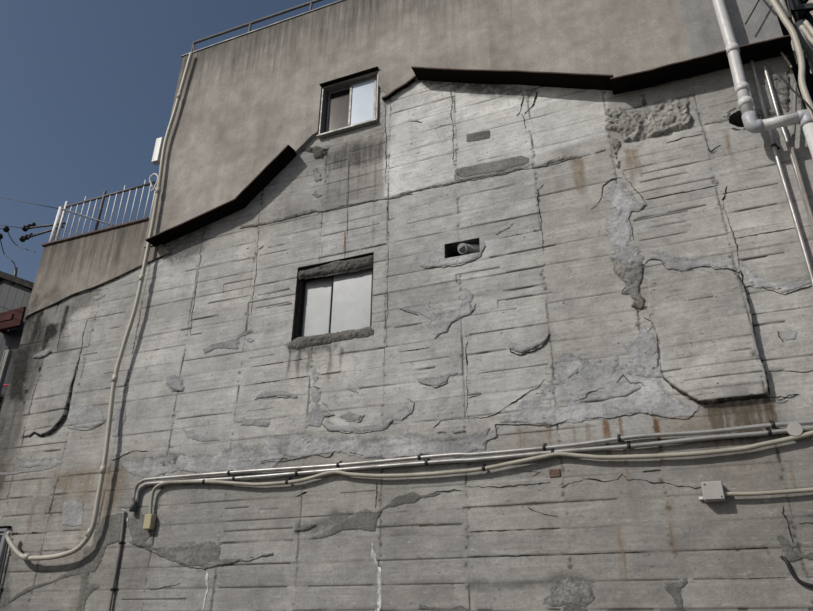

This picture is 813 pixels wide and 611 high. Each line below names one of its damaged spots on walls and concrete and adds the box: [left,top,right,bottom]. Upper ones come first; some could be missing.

spalling [704,108,746,131]
spalling [239,97,693,229]
damp [24,306,69,348]
damp [10,349,28,404]
peeling [579,386,641,403]
damp [371,543,381,611]
spalling [543,575,596,607]